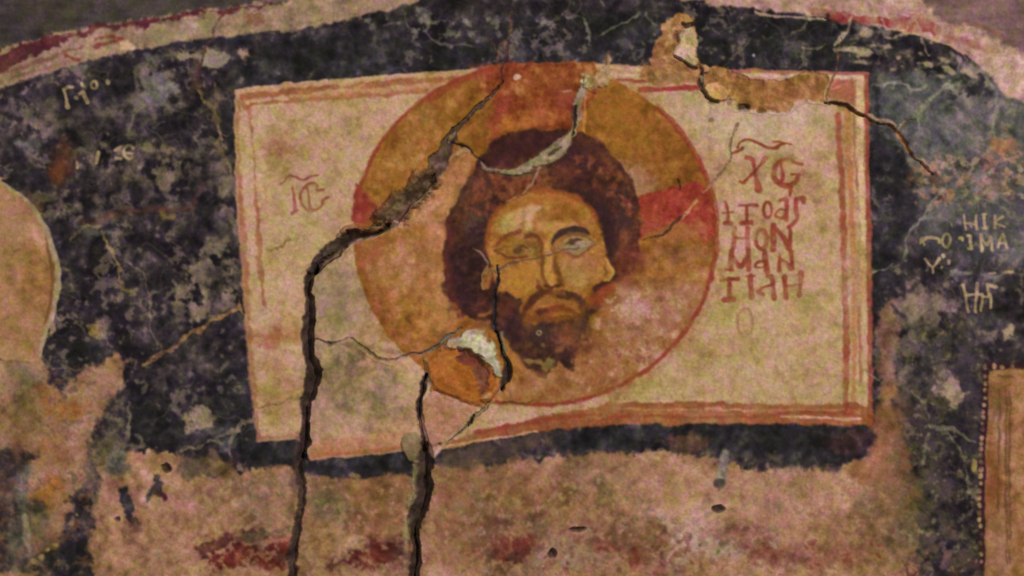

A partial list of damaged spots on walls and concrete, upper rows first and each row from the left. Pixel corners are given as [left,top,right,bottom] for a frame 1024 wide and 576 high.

spalling [635,11,829,123]
crack [723,12,1003,274]
crack [178,9,659,576]
peeling [425,326,503,409]